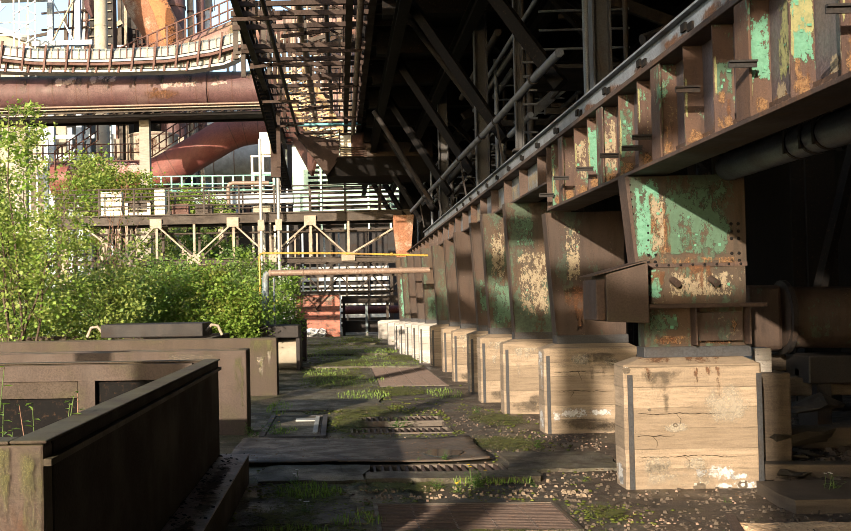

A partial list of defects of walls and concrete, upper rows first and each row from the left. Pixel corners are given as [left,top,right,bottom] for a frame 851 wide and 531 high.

rust [148,0,176,45]
peeling [750,0,815,112]
peeling [479,216,549,325]